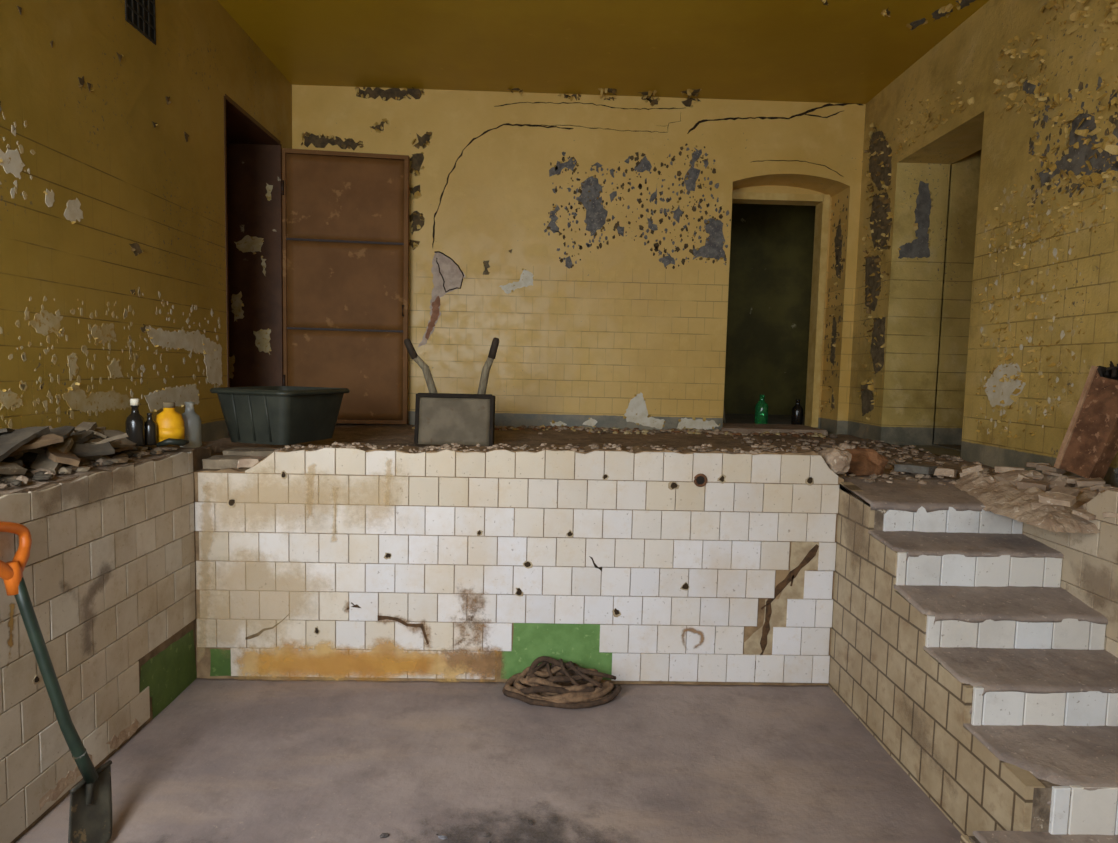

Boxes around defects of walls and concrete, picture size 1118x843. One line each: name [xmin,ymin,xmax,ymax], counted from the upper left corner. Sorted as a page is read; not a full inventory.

peeling [0,101,35,199]
peeling [0,288,235,429]
peeling [301,132,364,150]
peeling [355,86,425,101]
spalling [418,251,466,347]
peeling [544,143,731,269]
crack [432,102,863,247]
peeling [623,393,720,430]
peeling [857,81,974,420]
peeling [976,0,1118,438]
spalling [0,442,844,843]
crack [755,544,819,669]